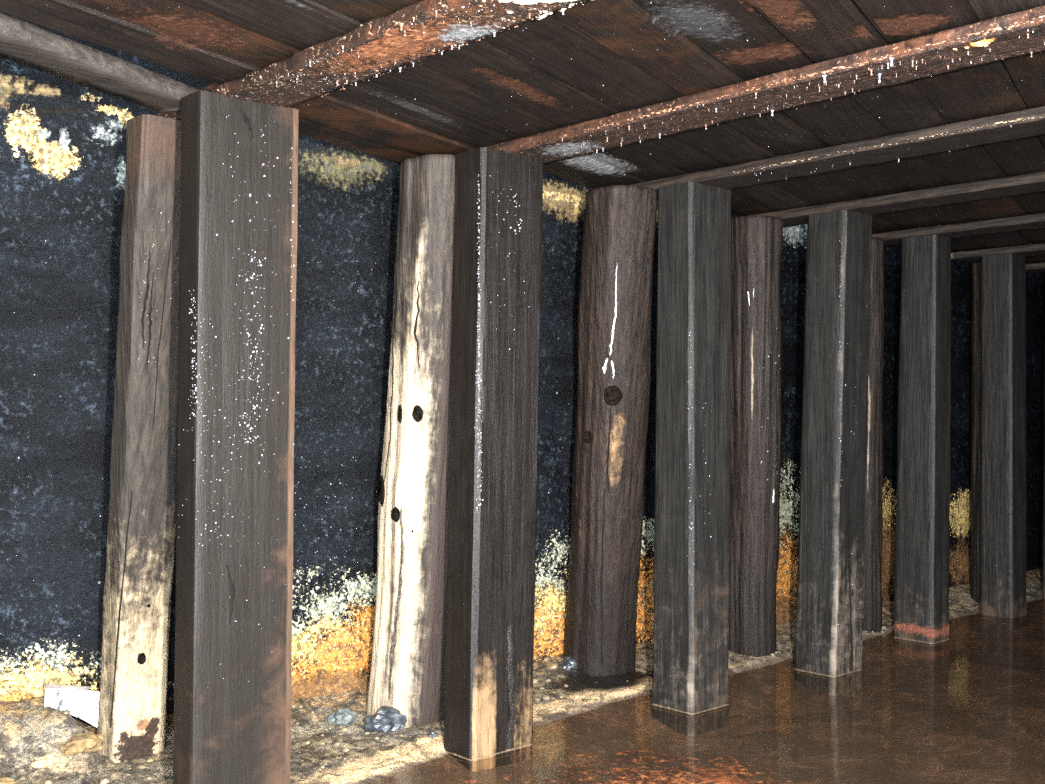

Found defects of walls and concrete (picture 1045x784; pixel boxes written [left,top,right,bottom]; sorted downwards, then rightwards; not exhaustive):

crack [141,242,171,430]
crack [383,282,421,484]
damp [602,268,617,378]